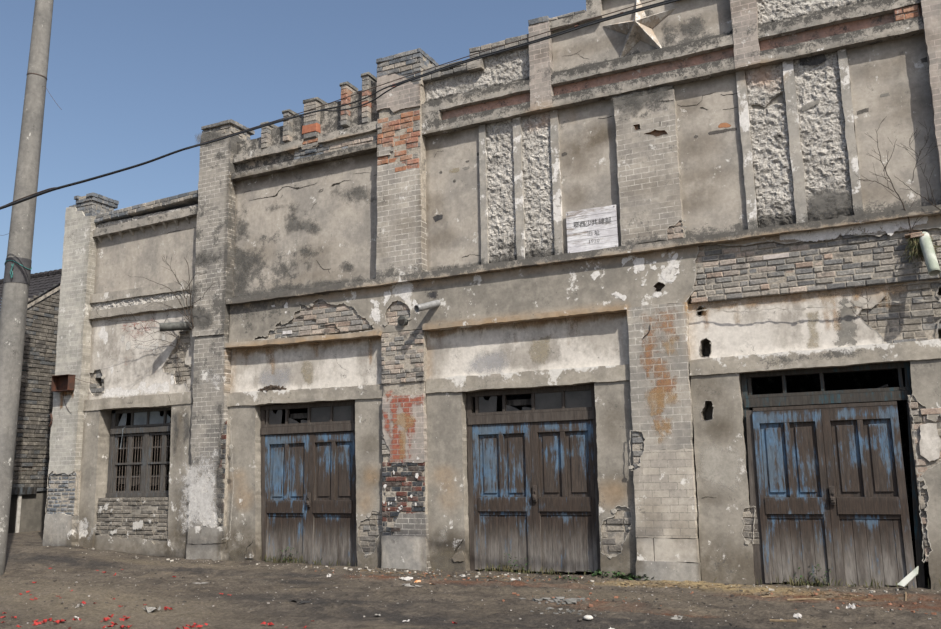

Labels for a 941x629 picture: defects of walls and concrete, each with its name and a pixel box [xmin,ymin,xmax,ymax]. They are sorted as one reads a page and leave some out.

leakage [286,205,320,234]
crack [244,172,375,210]
leakage [234,222,361,297]
flaking render [685,216,941,344]
flaking render [88,331,192,398]
flaking render [253,287,426,385]
flaking render [45,470,94,536]
flaking render [357,415,428,557]
flaking render [598,504,632,559]
flaking render [629,430,646,471]
flaking render [741,505,760,544]
flaking render [907,394,941,563]